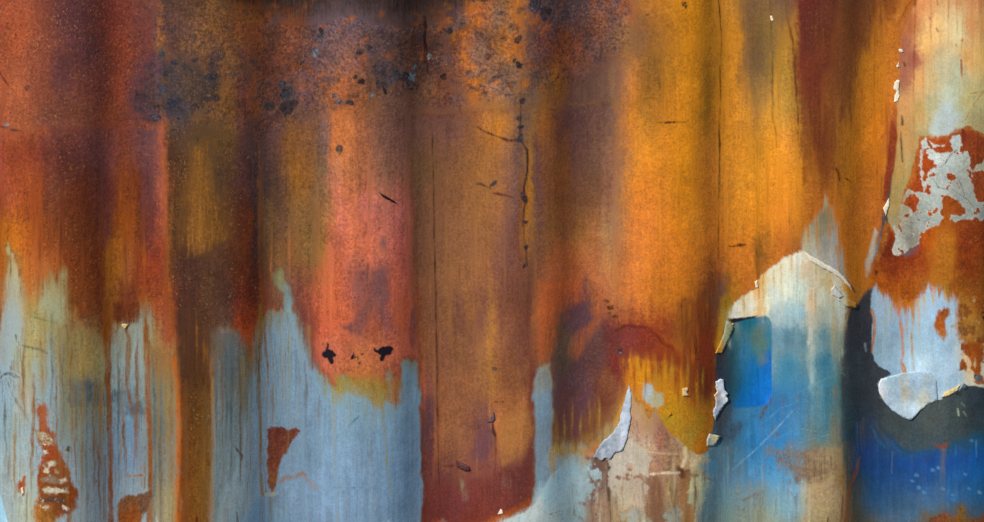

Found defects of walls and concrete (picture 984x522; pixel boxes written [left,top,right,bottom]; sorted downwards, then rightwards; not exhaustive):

corrosion [0,0,540,522]
corrosion [513,0,984,481]
peeling [728,251,850,395]
peeling [498,417,720,522]
corrosion [909,440,984,522]